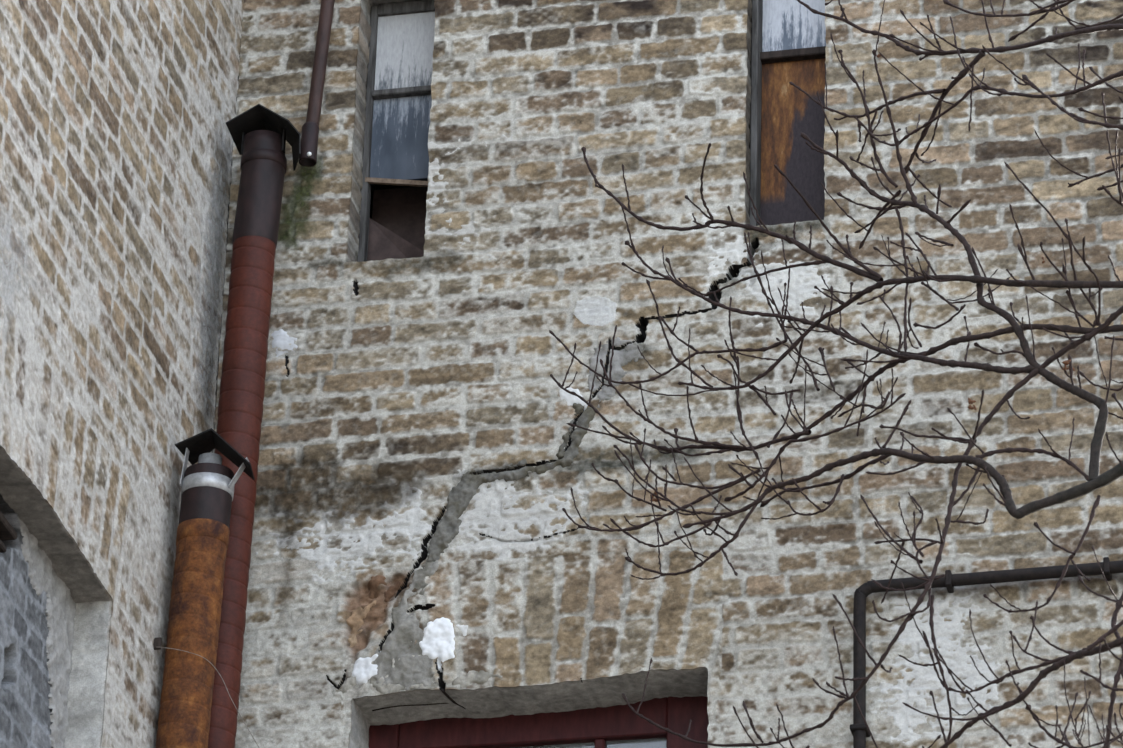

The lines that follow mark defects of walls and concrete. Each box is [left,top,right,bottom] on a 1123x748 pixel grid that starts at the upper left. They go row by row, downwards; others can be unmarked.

crack [351,281,359,296]
crack [473,237,760,475]
crack [531,526,587,541]
peeling [255,477,434,648]
crack [379,506,446,653]
crack [326,669,347,690]
crack [372,659,466,711]